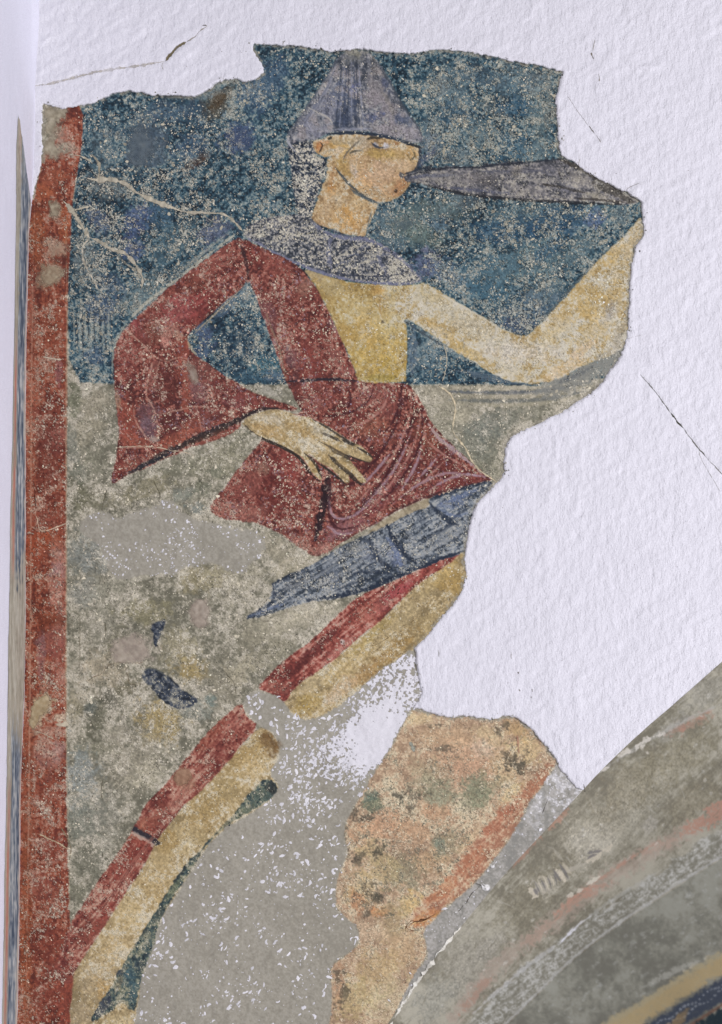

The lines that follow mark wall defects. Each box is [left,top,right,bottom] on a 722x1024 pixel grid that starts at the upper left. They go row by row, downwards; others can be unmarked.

crack [35,25,207,86]
crack [69,154,242,230]
crack [63,201,144,292]
crack [640,374,722,491]
peeling [304,654,421,787]